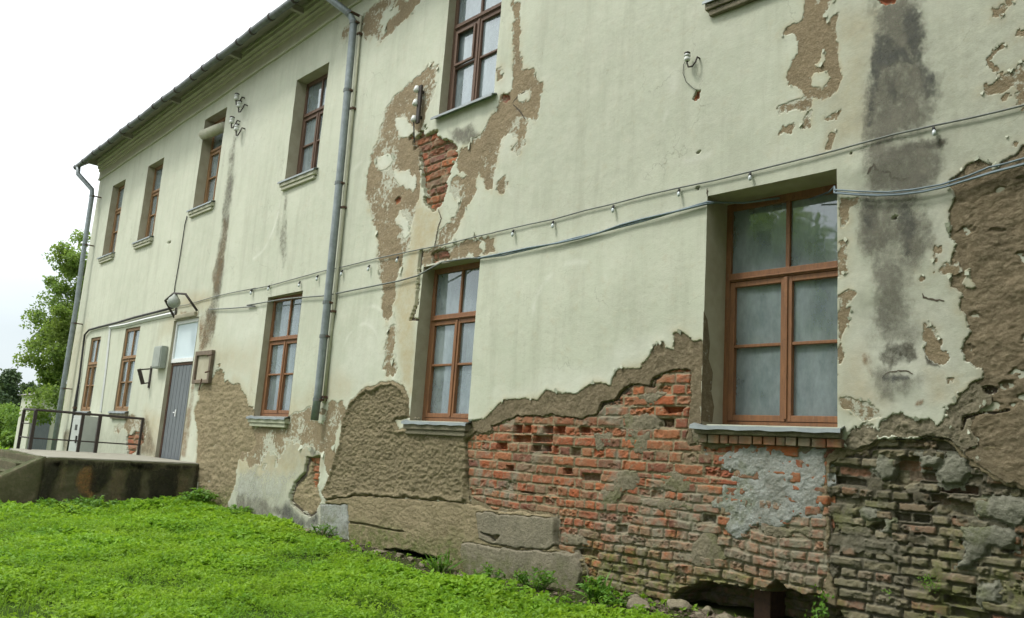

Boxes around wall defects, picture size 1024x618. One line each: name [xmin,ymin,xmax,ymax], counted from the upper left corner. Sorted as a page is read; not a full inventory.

leakage [202,174,233,344]
flaking render [342,0,420,43]
flaking render [366,0,543,321]
flaking render [777,0,843,136]
flaking render [825,110,841,150]
leakage [860,0,945,395]
flaking render [980,29,1024,111]
flaking render [992,0,1015,18]
flaking render [114,414,148,454]
flaking render [194,142,1024,618]